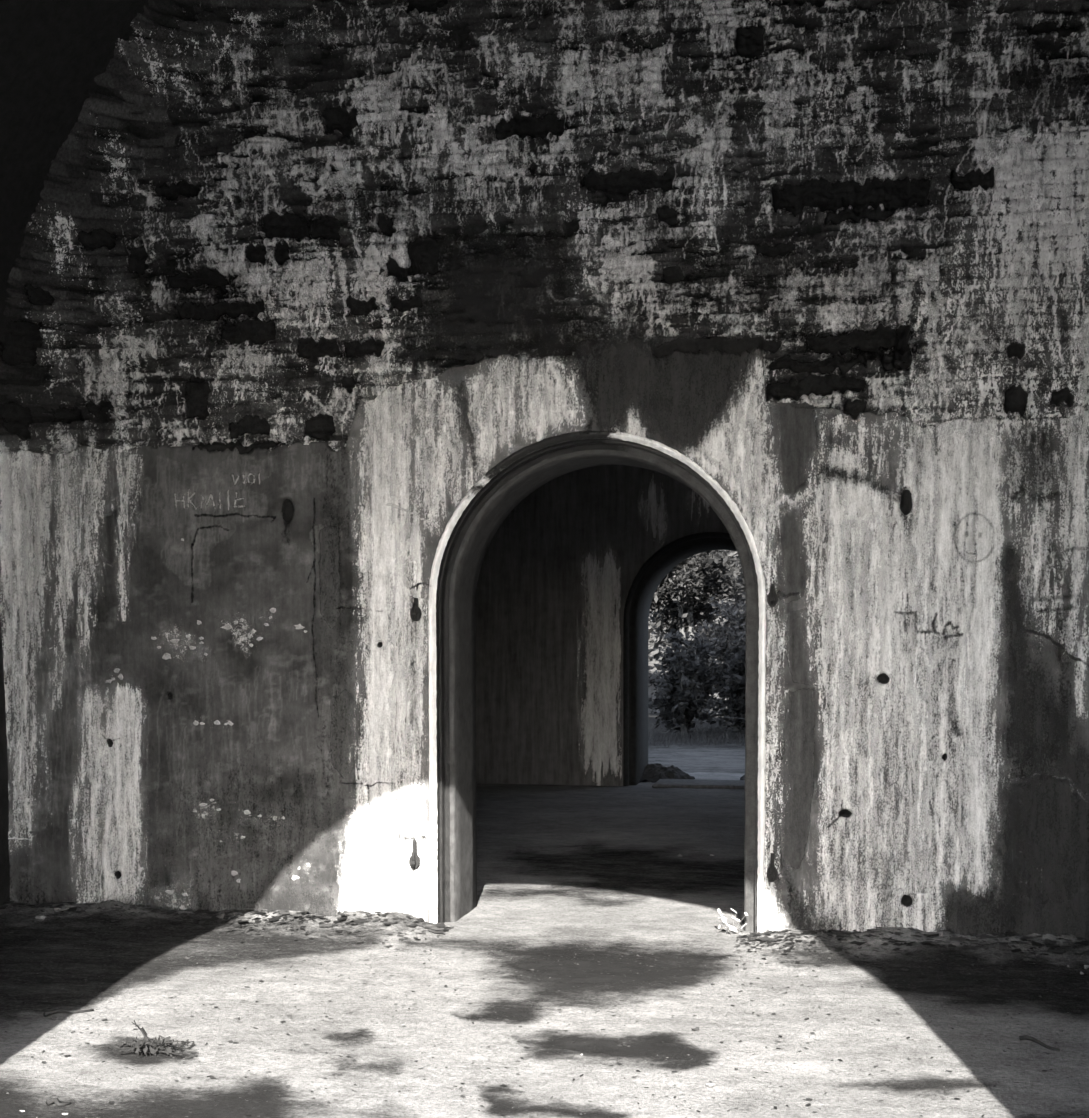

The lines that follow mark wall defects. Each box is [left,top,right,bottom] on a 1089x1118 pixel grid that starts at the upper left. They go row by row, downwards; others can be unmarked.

damp [967,0,988,57]
damp [732,33,964,181]
spalling [772,176,930,225]
spalling [950,166,995,191]
spalling [245,212,342,265]
spalling [386,236,439,283]
spalling [297,336,385,363]
spalling [1004,385,1028,416]
damp [0,0,776,1023]
damp [685,120,1089,1019]
damp [404,939,732,1070]
damp [327,1029,374,1045]